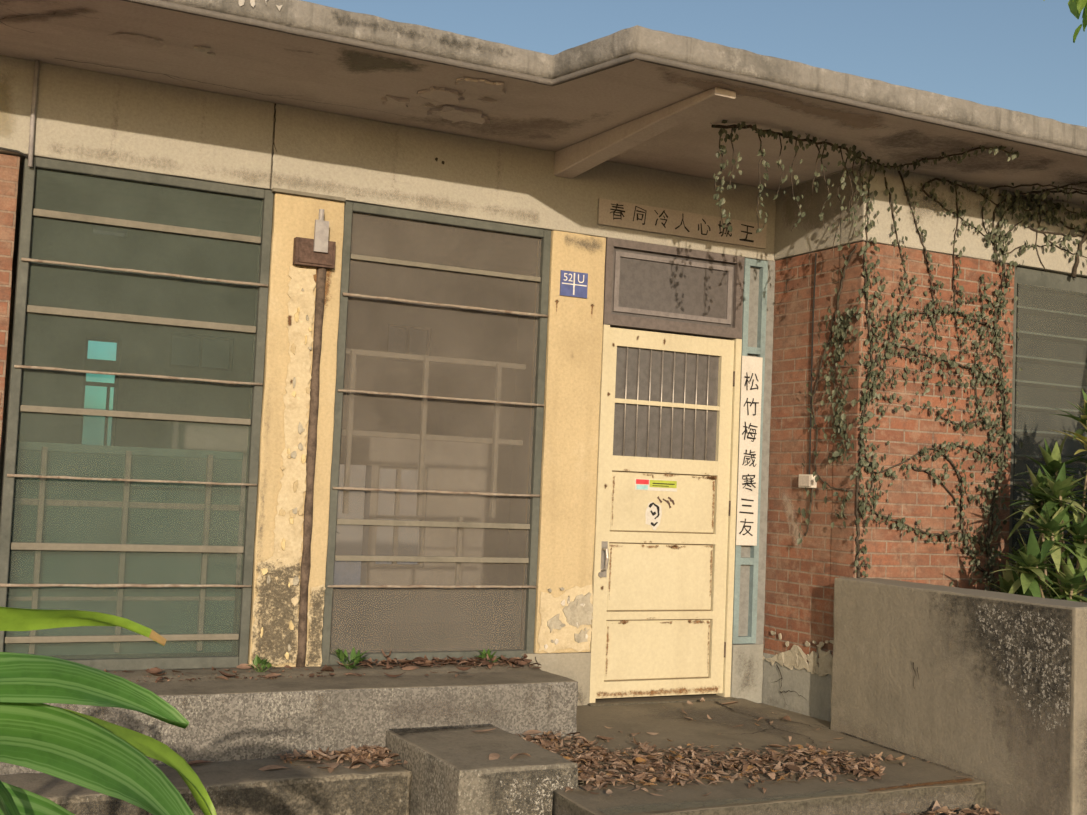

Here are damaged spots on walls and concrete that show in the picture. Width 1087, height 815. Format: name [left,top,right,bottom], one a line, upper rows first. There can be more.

crack [56,58,436,188]
peeling [251,265,326,667]
peeling [538,585,593,653]
rust [597,687,718,696]
flaking render [763,631,833,676]
leakage [944,594,1072,787]